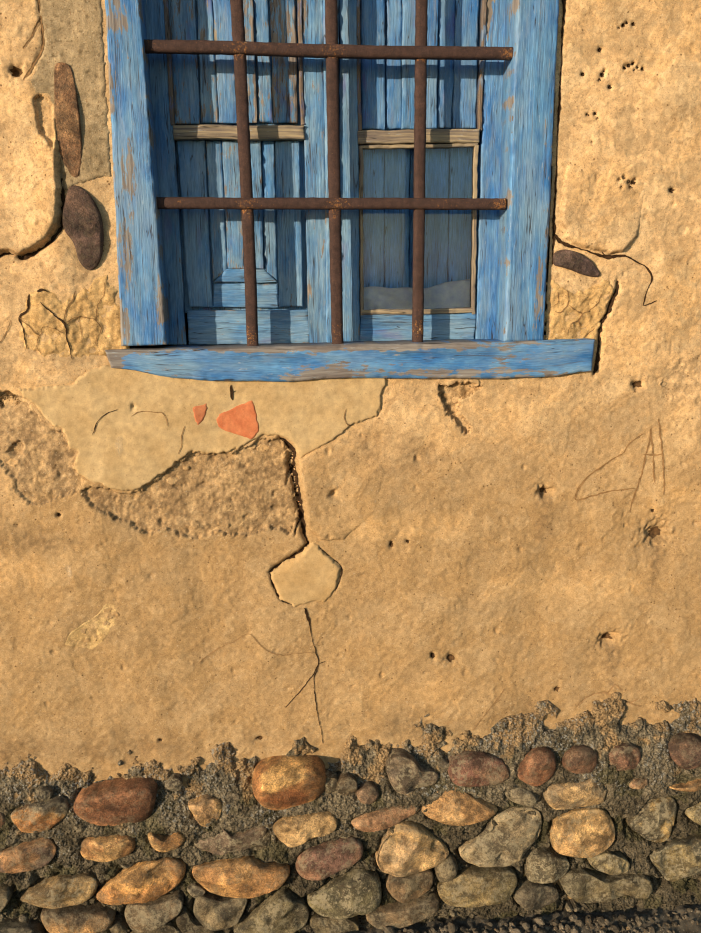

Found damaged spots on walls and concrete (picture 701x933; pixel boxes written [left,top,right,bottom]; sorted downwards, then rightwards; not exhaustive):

crack [0,178,65,260]
crack [552,0,657,306]
crack [593,281,619,375]
flaking render [0,390,300,540]
crack [198,438,343,742]